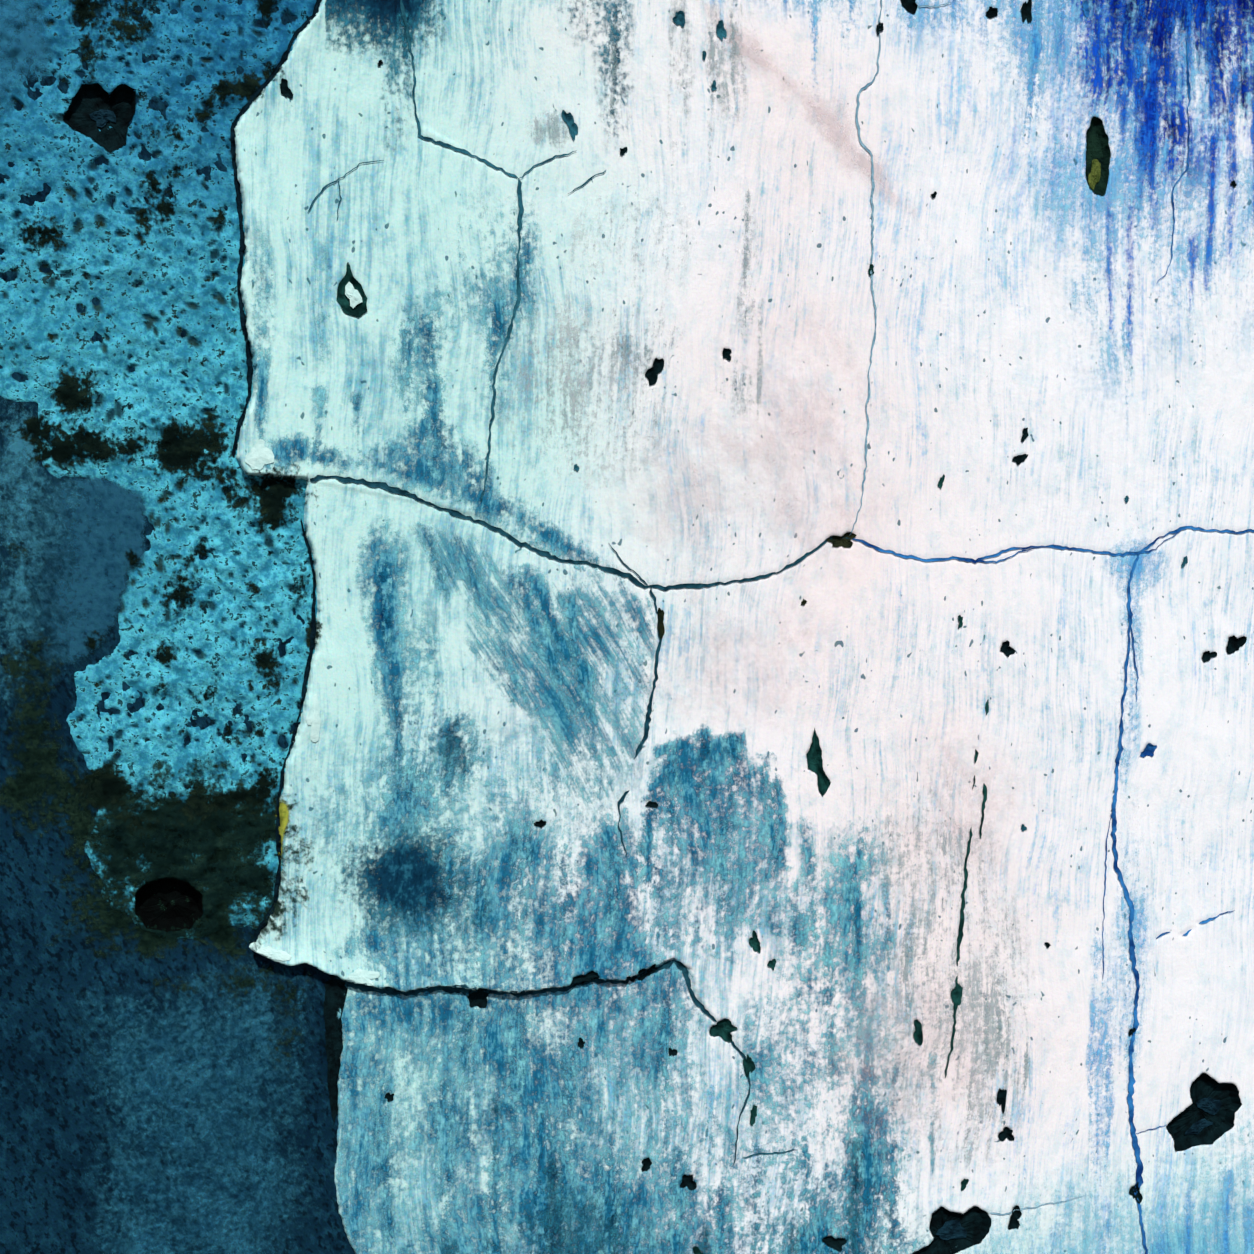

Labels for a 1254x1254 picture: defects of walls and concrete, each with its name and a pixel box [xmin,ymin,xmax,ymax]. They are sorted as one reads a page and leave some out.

crack [230,0,321,457]
peeling [345,282,362,308]
spalling [0,0,321,822]
water stain [293,575,322,647]
crack [306,0,1254,1254]
crack [251,519,317,943]
spalling [84,807,150,926]
water stain [0,369,316,1254]
spalling [228,837,291,961]
peeling [348,968,380,986]
peeling [1185,1097,1222,1135]
peeling [936,1220,967,1240]